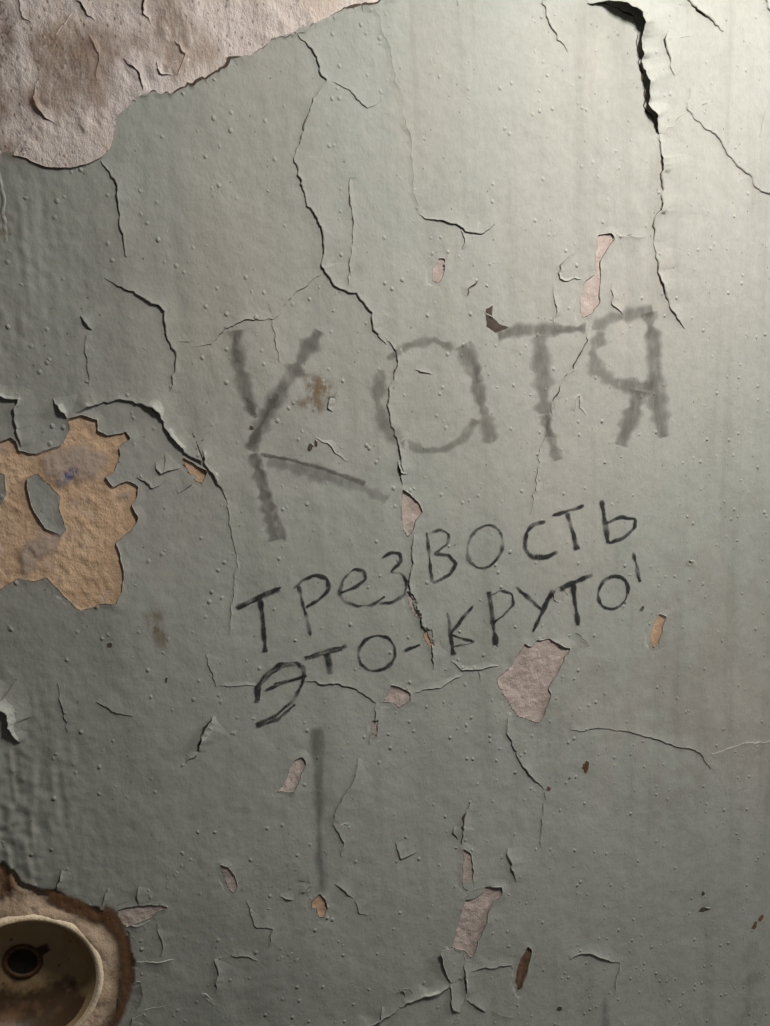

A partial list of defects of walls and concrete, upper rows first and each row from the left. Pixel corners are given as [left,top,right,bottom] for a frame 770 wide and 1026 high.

peeling [33,79,57,124]
peeling [124,39,194,90]
crack [541,0,770,329]
crack [72,0,497,634]
peeling [0,384,214,618]
crack [530,324,592,515]
peeling [0,679,33,743]
crack [408,534,499,694]
peeling [489,629,590,728]
crack [214,669,386,993]
crack [247,954,514,1026]
peeling [440,842,512,1012]